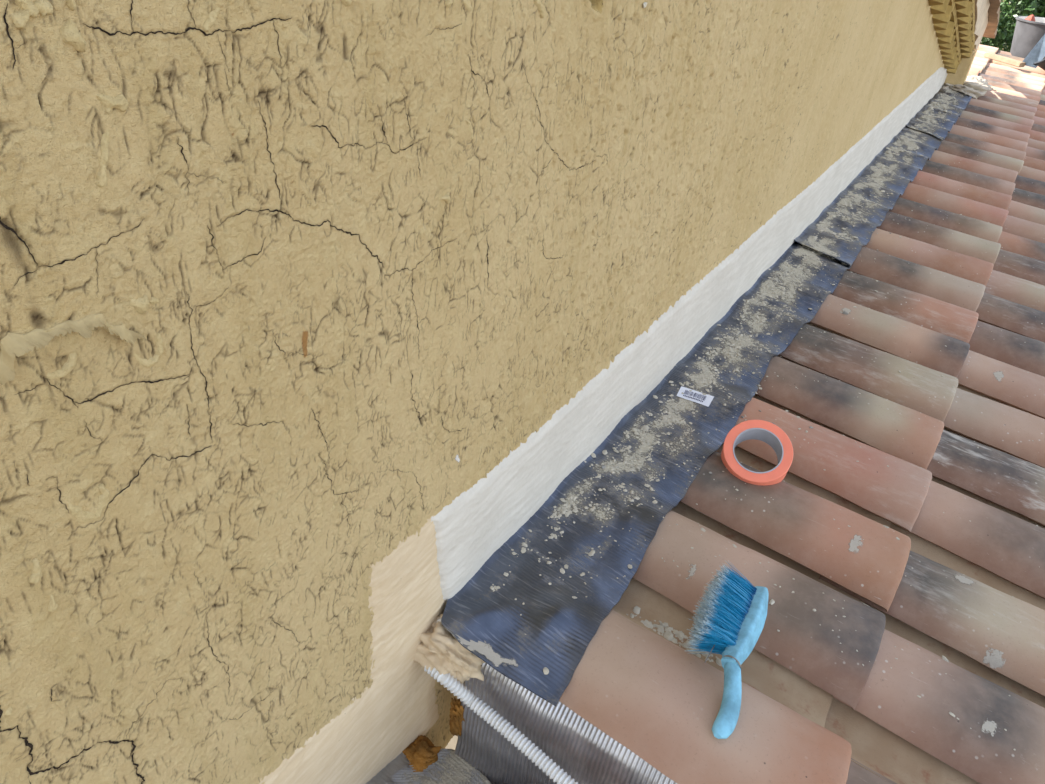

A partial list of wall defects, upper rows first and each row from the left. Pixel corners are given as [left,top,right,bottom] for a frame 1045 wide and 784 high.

crack [3,4,21,68]
crack [85,0,291,96]
peeling [0,313,147,385]
crack [0,97,463,534]
crack [0,679,175,784]